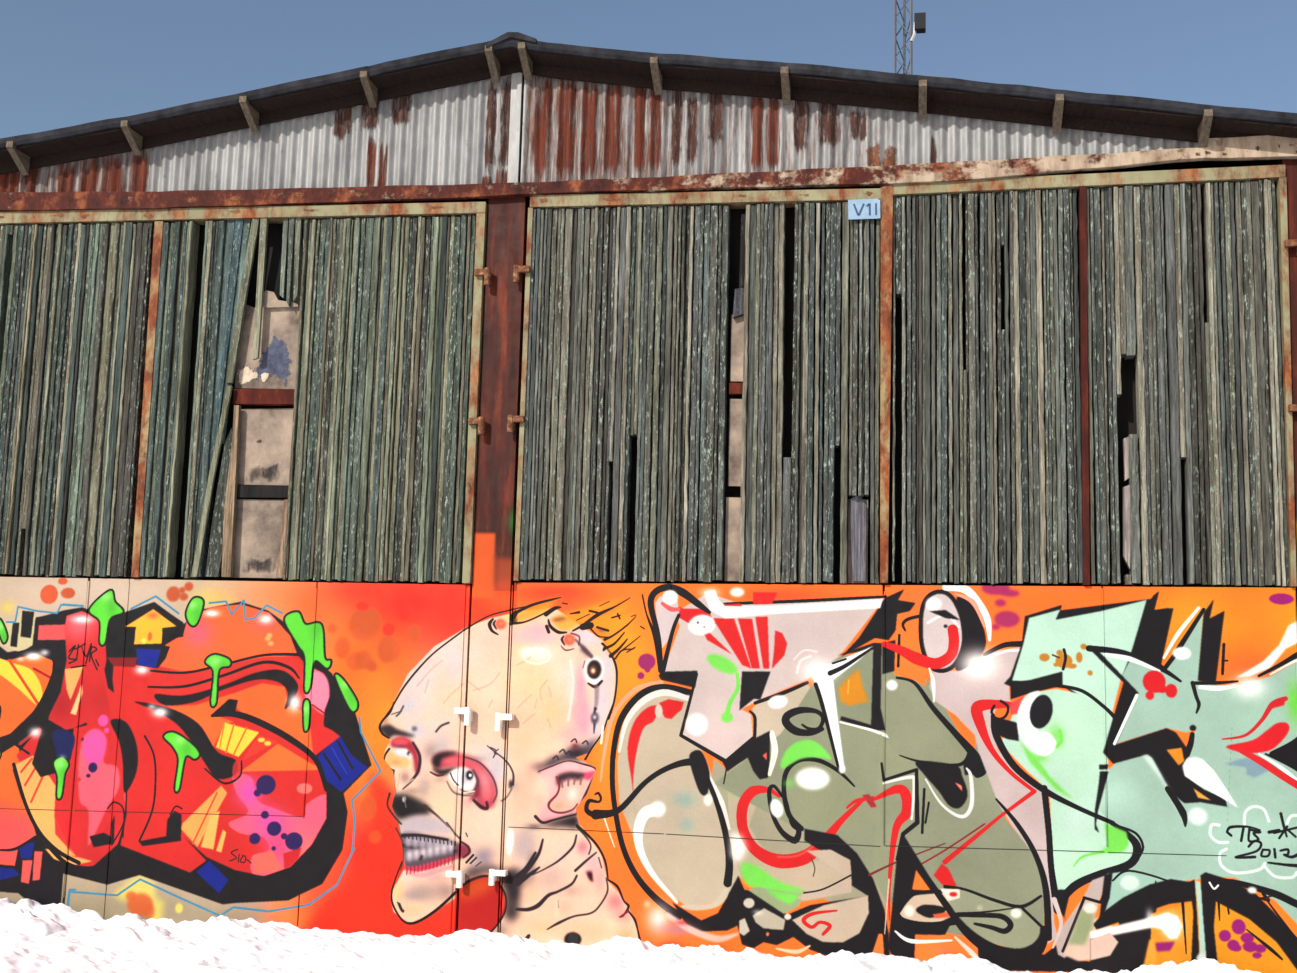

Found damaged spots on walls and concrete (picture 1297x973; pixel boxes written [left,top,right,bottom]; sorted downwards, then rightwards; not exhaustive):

corrosion [482,77,511,184]
corrosion [533,77,724,180]
corrosion [751,97,897,169]
corrosion [0,169,37,201]
corrosion [54,150,149,218]
peeling [237,336,292,386]